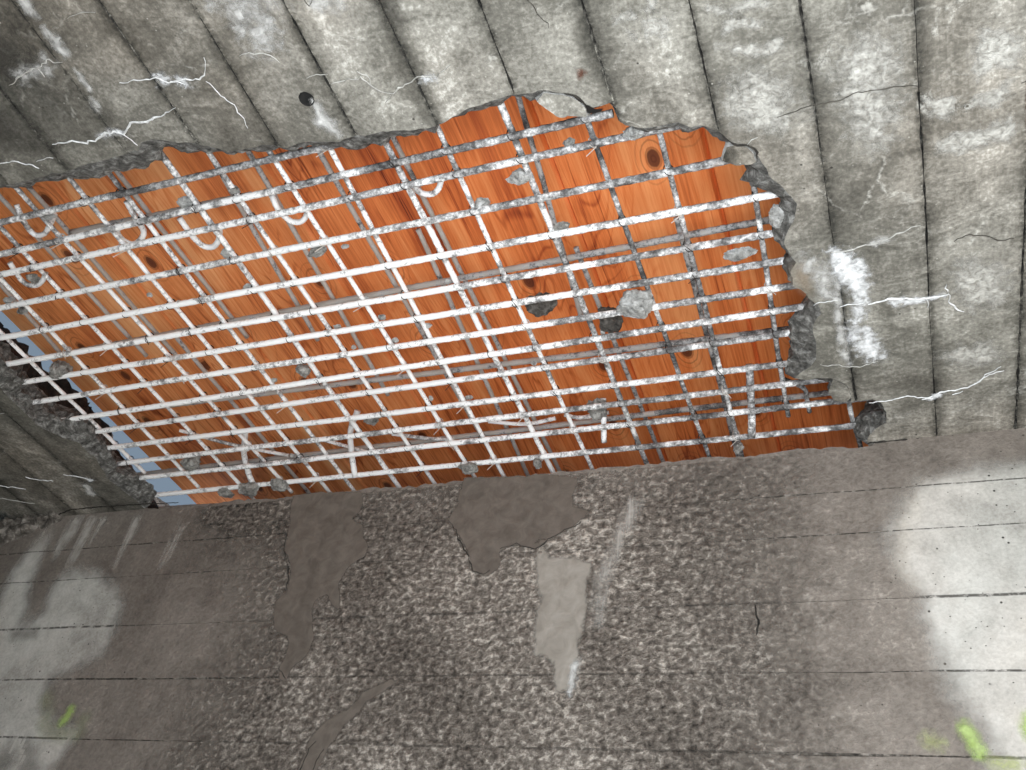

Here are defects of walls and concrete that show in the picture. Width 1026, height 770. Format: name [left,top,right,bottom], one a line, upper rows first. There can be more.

crack [0,56,248,169]
peeling [727,72,789,133]
damp [799,248,886,364]
crack [815,284,964,312]
crack [873,366,1002,403]
spalling [0,90,887,770]
crack [0,474,93,504]
crack [58,502,178,515]